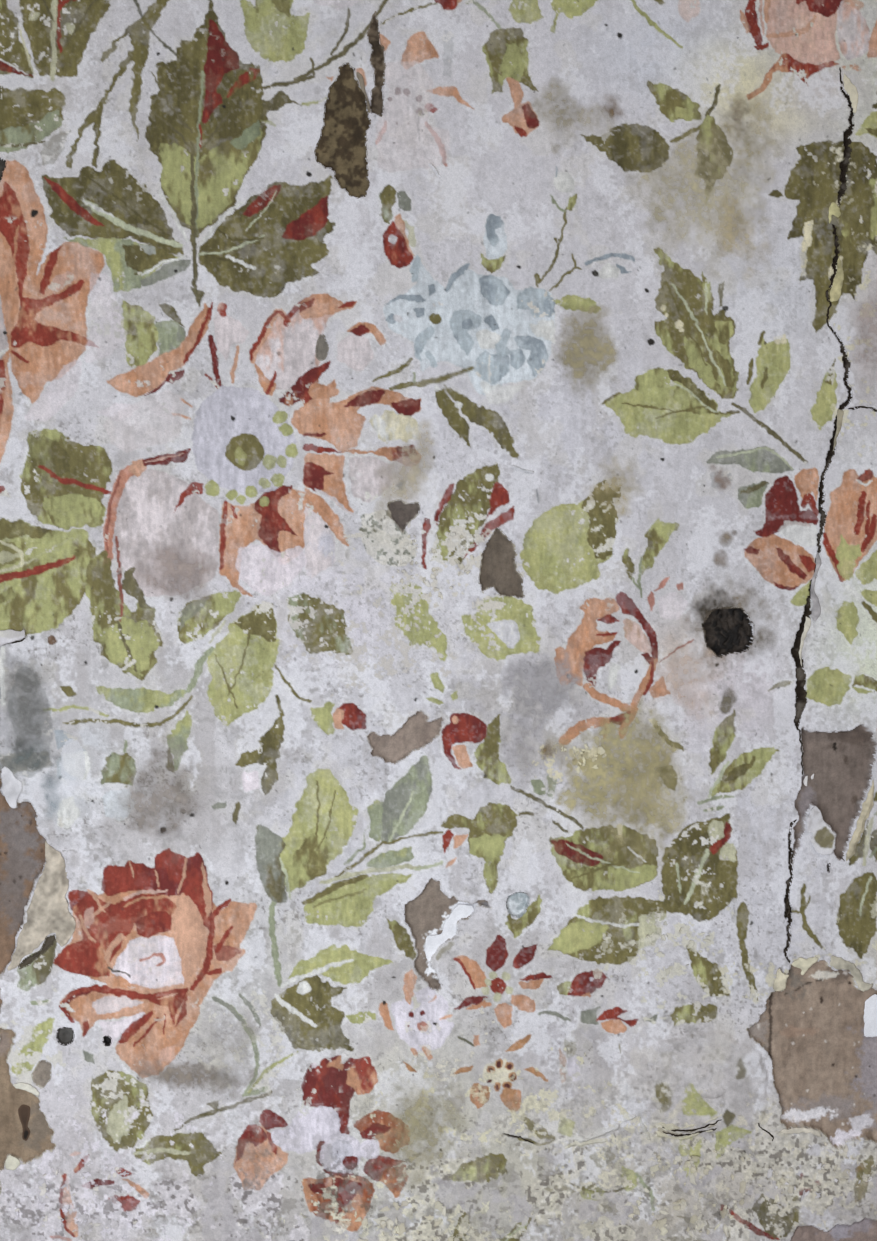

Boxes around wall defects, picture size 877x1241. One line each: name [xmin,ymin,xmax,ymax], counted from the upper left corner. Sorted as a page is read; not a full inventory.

crack [791,68,877,775]
peeling [0,629,25,646]
peeling [366,710,444,765]
peeling [790,724,877,866]
peeling [0,766,76,1194]
peeling [403,878,492,992]
crack [784,820,796,963]
peeling [624,955,877,1236]